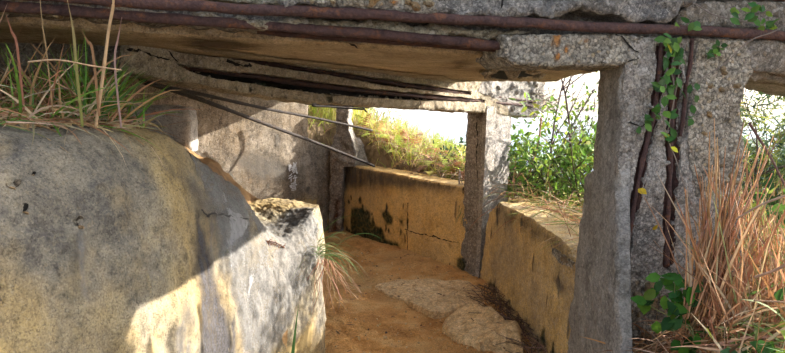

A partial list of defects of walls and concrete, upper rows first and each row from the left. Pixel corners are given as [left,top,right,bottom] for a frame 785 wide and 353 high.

spalling [285,0,437,14]
water stain [345,167,450,188]
water stain [346,197,408,246]
crack [405,203,459,250]